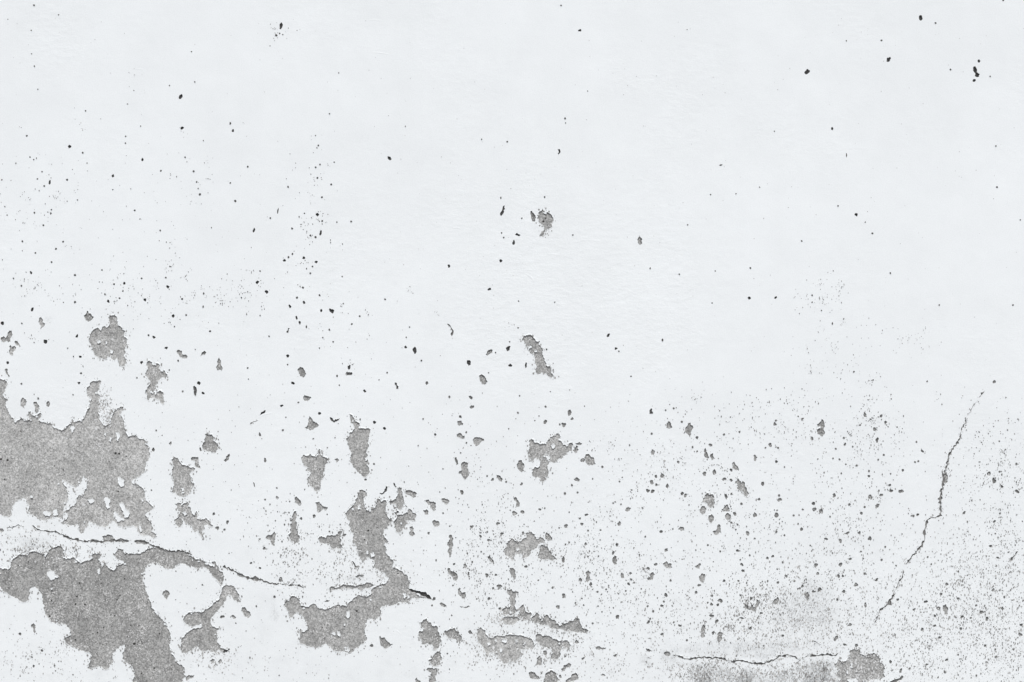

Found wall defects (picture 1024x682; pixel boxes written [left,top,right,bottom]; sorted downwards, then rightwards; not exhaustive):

peeling [83,310,129,368]
peeling [522,333,553,379]
peeling [144,360,168,405]
peeling [516,433,596,482]
crack [8,524,191,556]
peeling [0,368,259,682]
peeling [283,413,450,654]
crack [874,390,985,624]
crack [222,565,306,588]
peeling [476,531,589,682]
crack [673,641,878,665]
peeling [833,648,904,682]